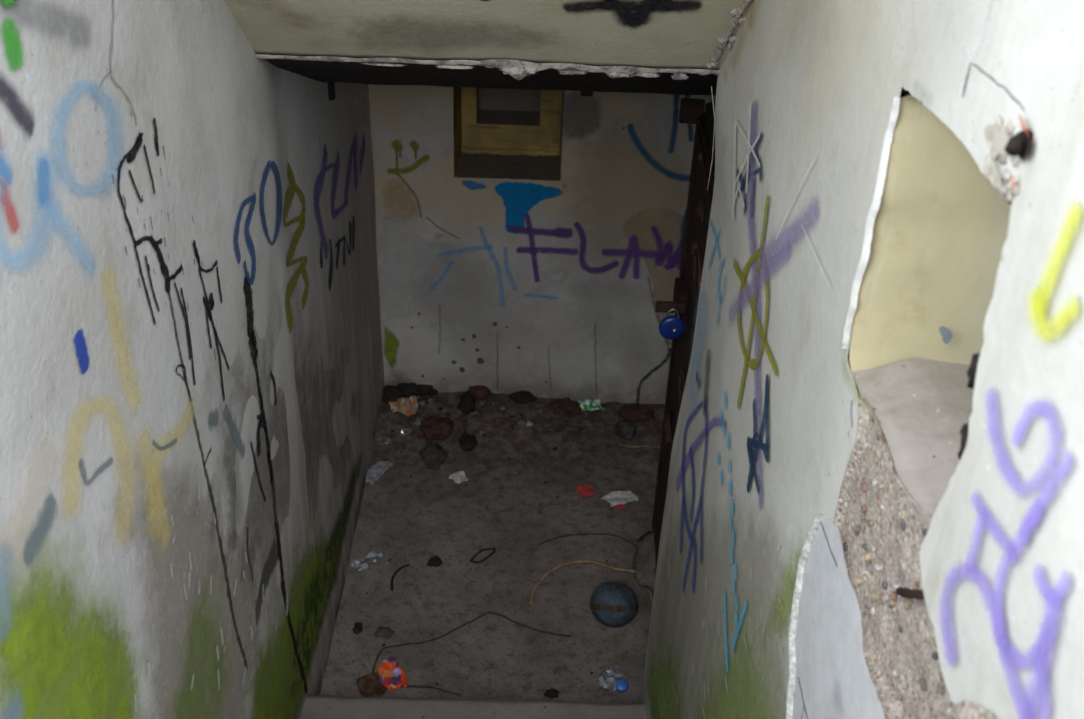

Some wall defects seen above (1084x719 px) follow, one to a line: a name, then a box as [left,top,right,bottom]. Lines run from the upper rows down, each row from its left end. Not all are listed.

spalling [255,0,753,81]
crack [962,63,1024,111]
flaking render [982,115,1029,205]
spalling [841,90,911,349]
spalling [967,351,981,393]
spalling [786,398,995,719]